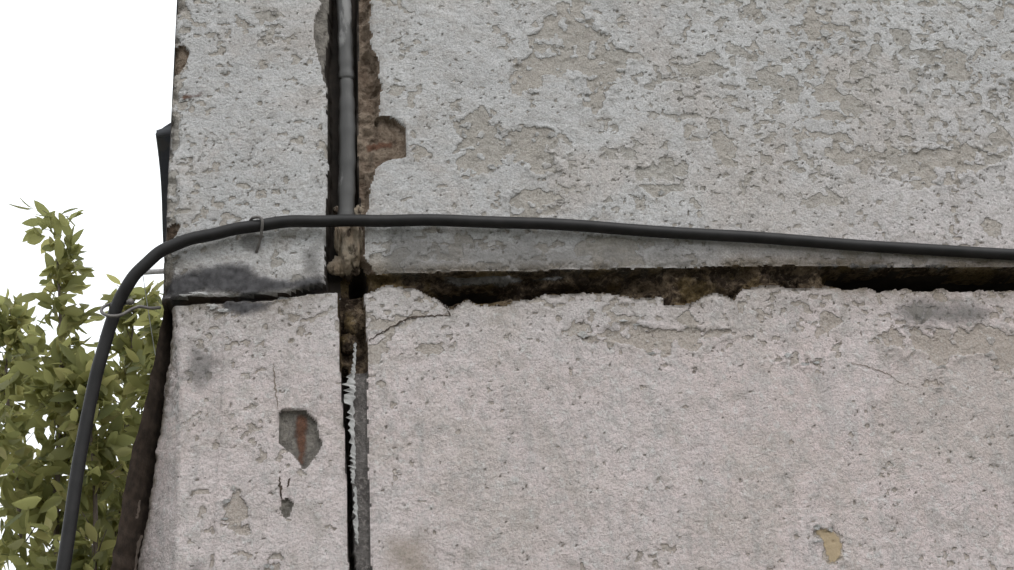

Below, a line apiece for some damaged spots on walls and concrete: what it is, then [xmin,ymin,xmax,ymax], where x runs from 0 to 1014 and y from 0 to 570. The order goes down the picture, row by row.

spalling [314,0,340,215]
spalling [351,0,406,215]
leakage [162,265,324,314]
spalling [324,227,377,300]
spalling [437,292,504,307]
spalling [824,271,1014,293]
spalling [279,410,322,469]
spalling [341,343,359,570]
peeling [813,524,844,565]